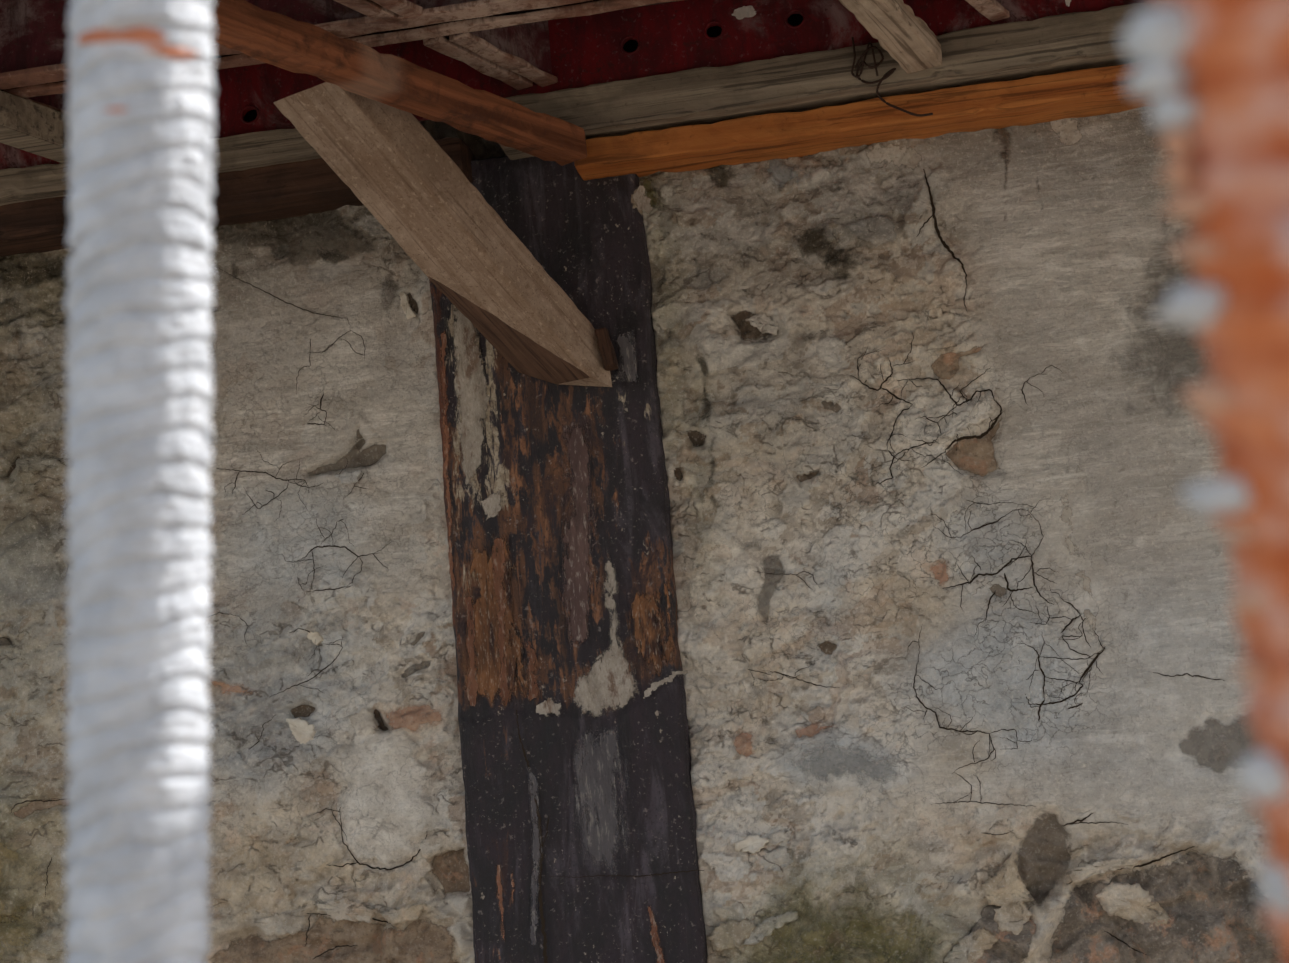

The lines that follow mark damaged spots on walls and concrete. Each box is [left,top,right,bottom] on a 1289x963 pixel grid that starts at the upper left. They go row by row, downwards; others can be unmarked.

crack [916,169,967,311]
crack [217,270,390,592]
peeling [453,308,489,485]
peeling [481,490,501,520]
peeling [536,423,688,717]
crack [850,333,1105,835]
spalling [944,814,1284,963]